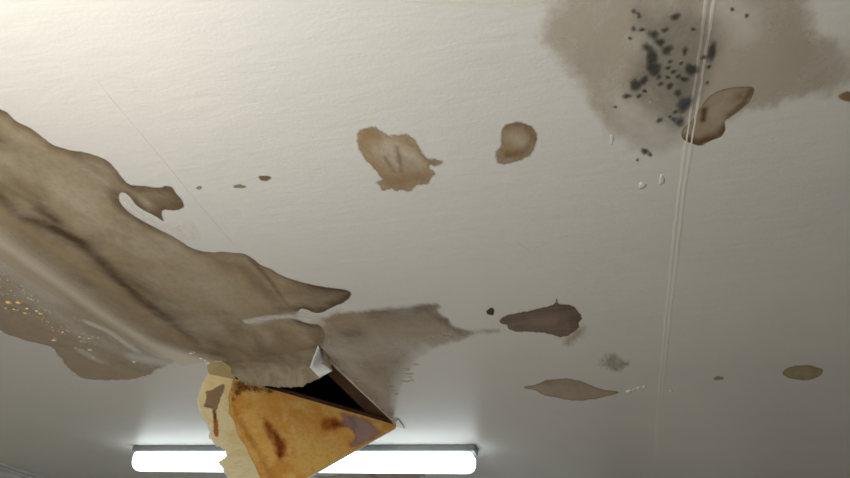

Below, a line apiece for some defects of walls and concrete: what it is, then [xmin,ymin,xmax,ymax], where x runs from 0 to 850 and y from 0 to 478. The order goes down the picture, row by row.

mould [624,27,697,125]
leakage [496,122,537,164]
leakage [0,110,469,363]
leakage [0,277,156,380]
peeling [225,346,332,388]